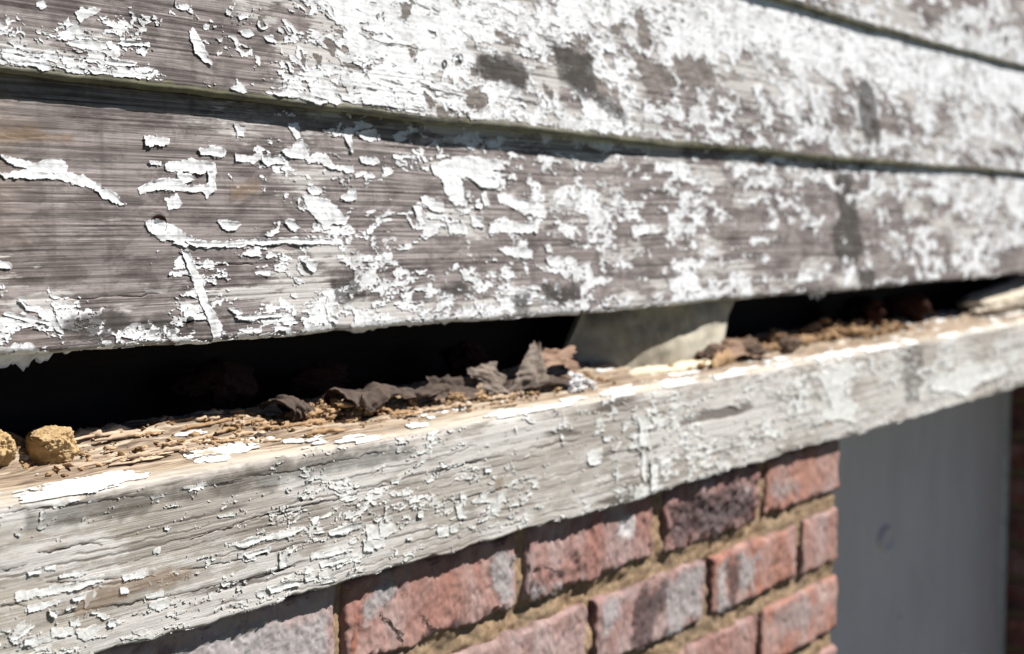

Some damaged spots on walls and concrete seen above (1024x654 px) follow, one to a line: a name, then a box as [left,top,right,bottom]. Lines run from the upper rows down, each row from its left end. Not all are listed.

peeling [189,27,212,65]
peeling [286,26,376,73]
peeling [610,8,717,100]
peeling [273,86,329,105]
peeling [423,89,487,121]
peeling [0,155,127,205]
peeling [137,122,380,338]
peeling [392,152,565,269]
peeling [0,351,71,371]
peeling [928,359,1007,396]
peeling [225,522,397,603]
peeling [14,565,117,641]